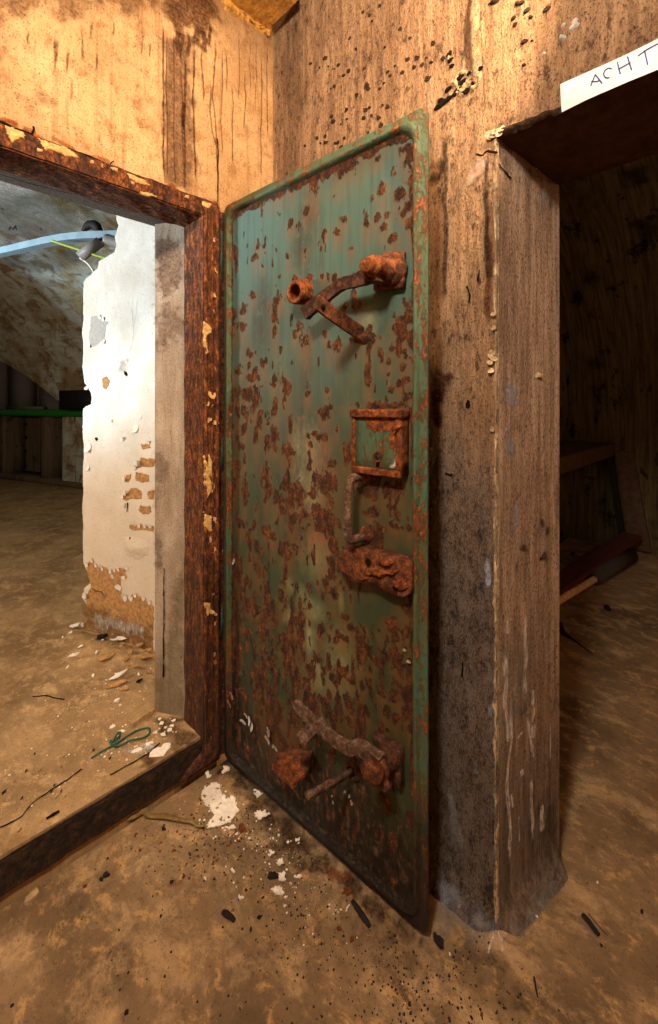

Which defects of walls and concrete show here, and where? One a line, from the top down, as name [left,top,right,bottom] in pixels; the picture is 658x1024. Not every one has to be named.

damp [141,0,268,187]
spalling [303,108,348,149]
spalling [309,40,485,134]
corrosion [365,417,396,453]
peeling [121,440,155,532]
peeling [81,558,154,651]
corrosion [128,718,195,765]
corrosion [229,772,330,874]